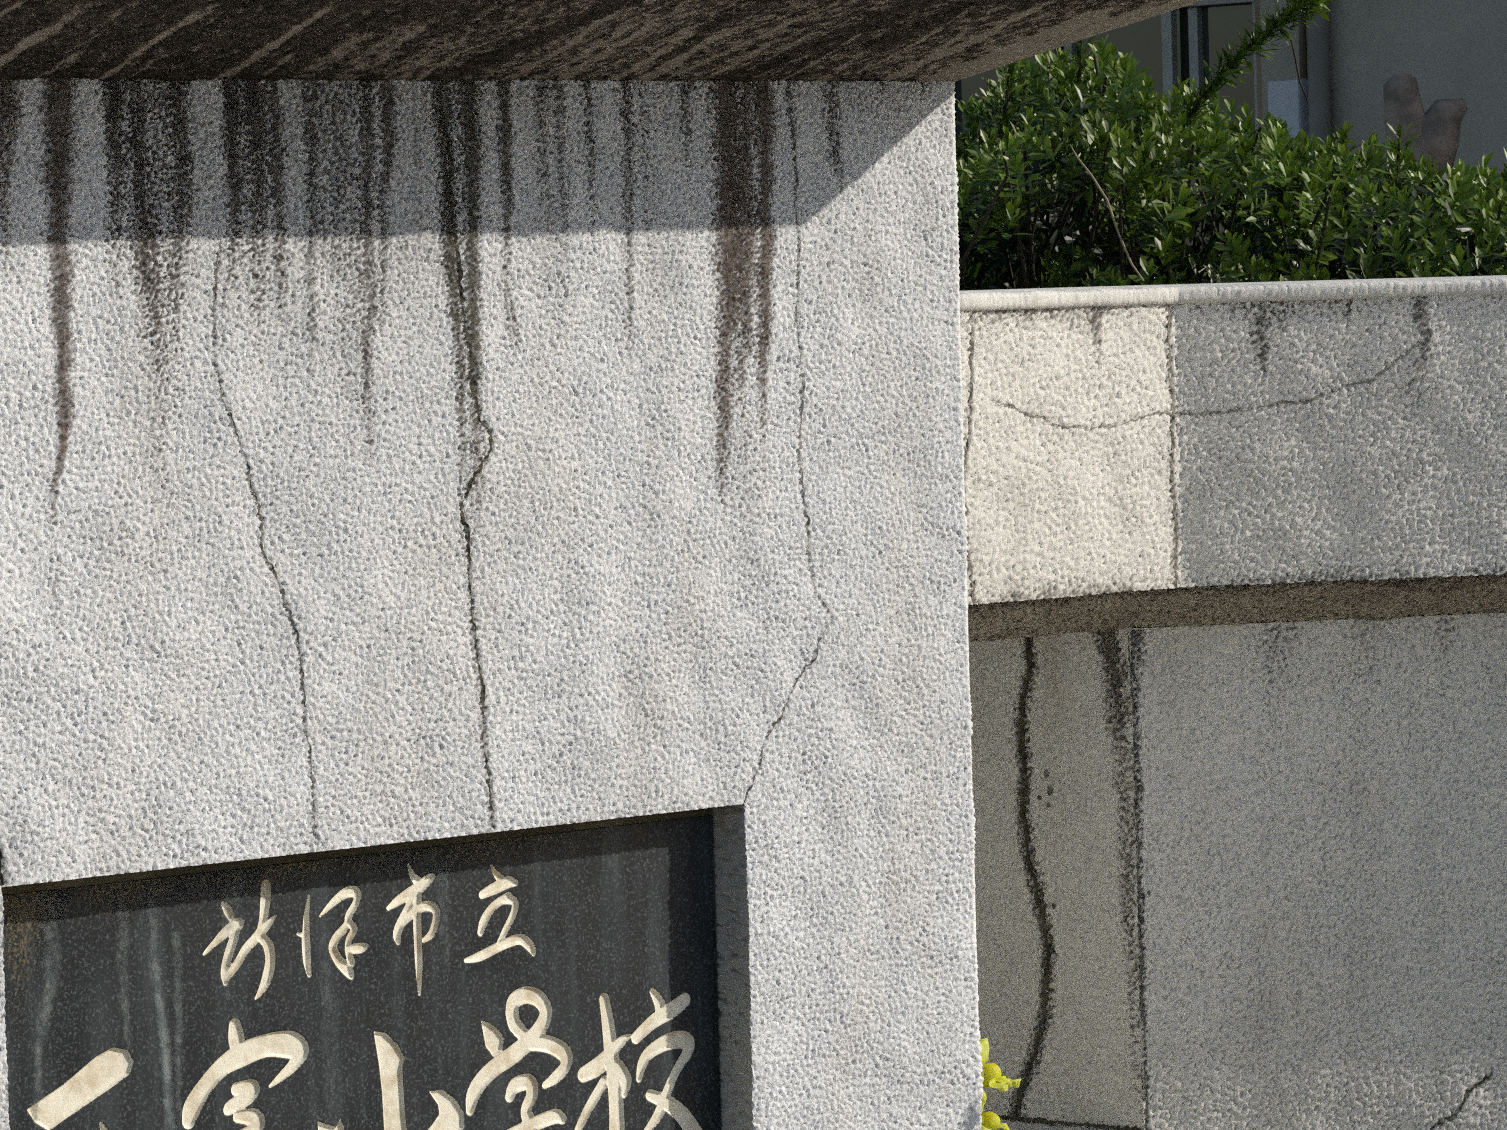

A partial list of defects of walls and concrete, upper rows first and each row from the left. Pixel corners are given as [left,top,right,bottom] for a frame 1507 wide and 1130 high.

crack [212,245,316,845]
crack [445,126,496,829]
water stain [0,0,1163,509]
crack [745,109,832,802]
crack [963,304,1431,604]
crack [0,849,8,885]
crack [981,634,1149,1130]
crack [1430,1073,1492,1130]